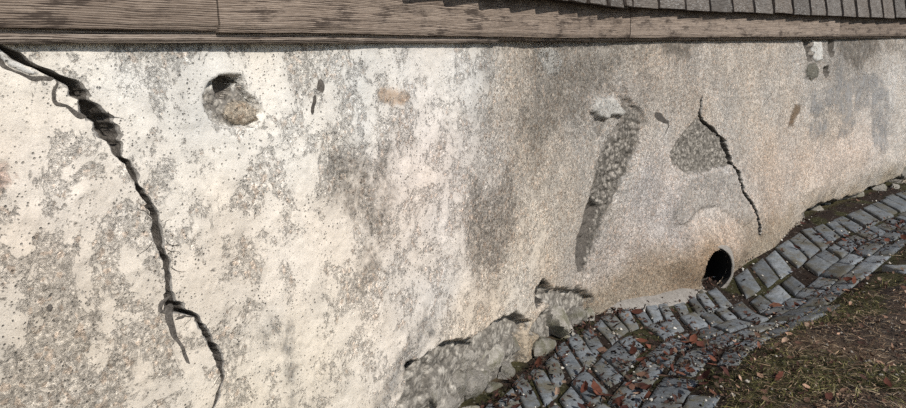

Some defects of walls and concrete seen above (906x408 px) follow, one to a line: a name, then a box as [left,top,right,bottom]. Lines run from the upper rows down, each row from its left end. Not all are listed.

crack [0,44,225,408]
spalling [202,76,258,128]
flaking render [522,51,640,272]
crack [655,112,669,133]
flaking render [670,118,728,174]
crack [697,97,762,235]
flaking render [395,281,594,408]